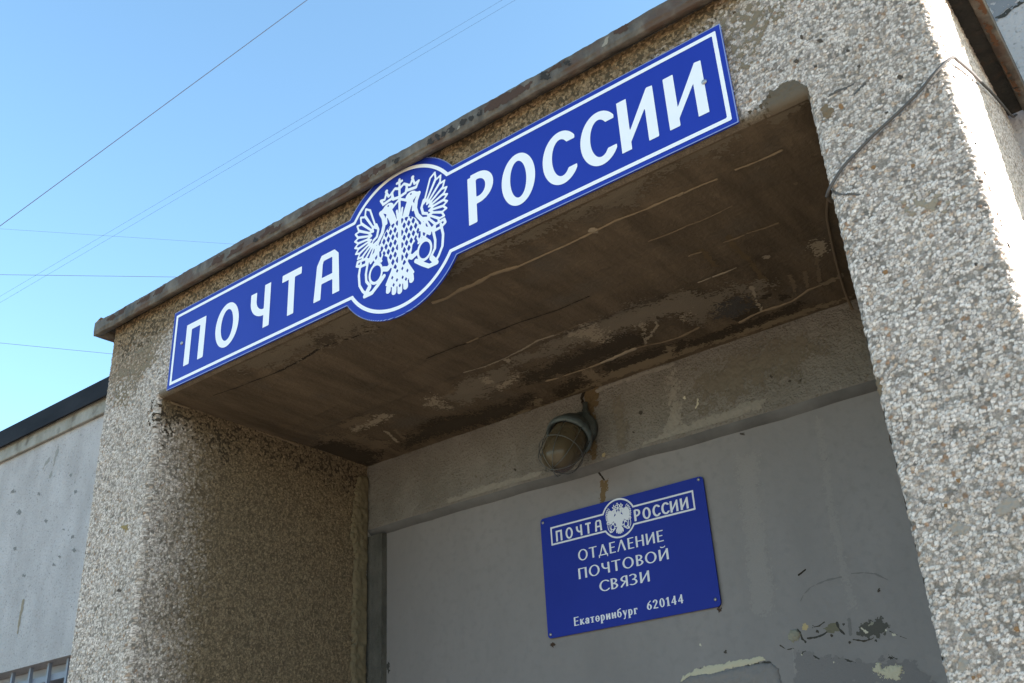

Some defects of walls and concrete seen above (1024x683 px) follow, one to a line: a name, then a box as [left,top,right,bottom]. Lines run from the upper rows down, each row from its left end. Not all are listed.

crack [426,296,590,373]
leakage [148,235,844,495]
rust [600,478,609,503]
spalling [848,616,897,644]
peeling [681,650,765,682]